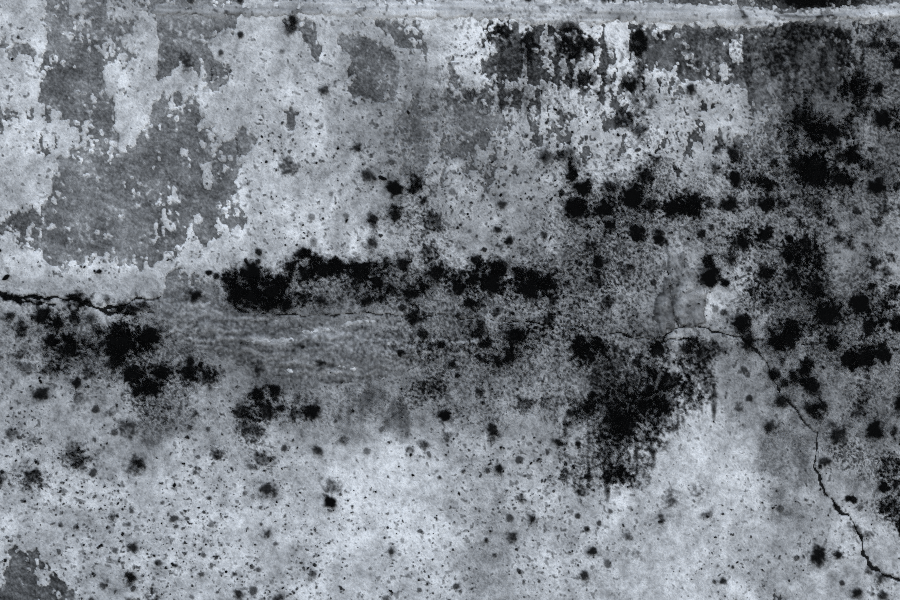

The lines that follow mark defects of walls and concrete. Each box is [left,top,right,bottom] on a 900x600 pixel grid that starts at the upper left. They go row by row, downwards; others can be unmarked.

peeling [0,0,259,305]
peeling [284,107,299,131]
peeling [282,17,322,63]
peeling [337,18,900,196]
water stain [616,28,659,140]
crack [0,291,161,316]
water stain [1,290,218,401]
water stain [205,174,569,367]
water stain [537,105,900,537]
water stain [233,385,321,469]
crack [199,298,900,582]
peeling [0,544,76,600]